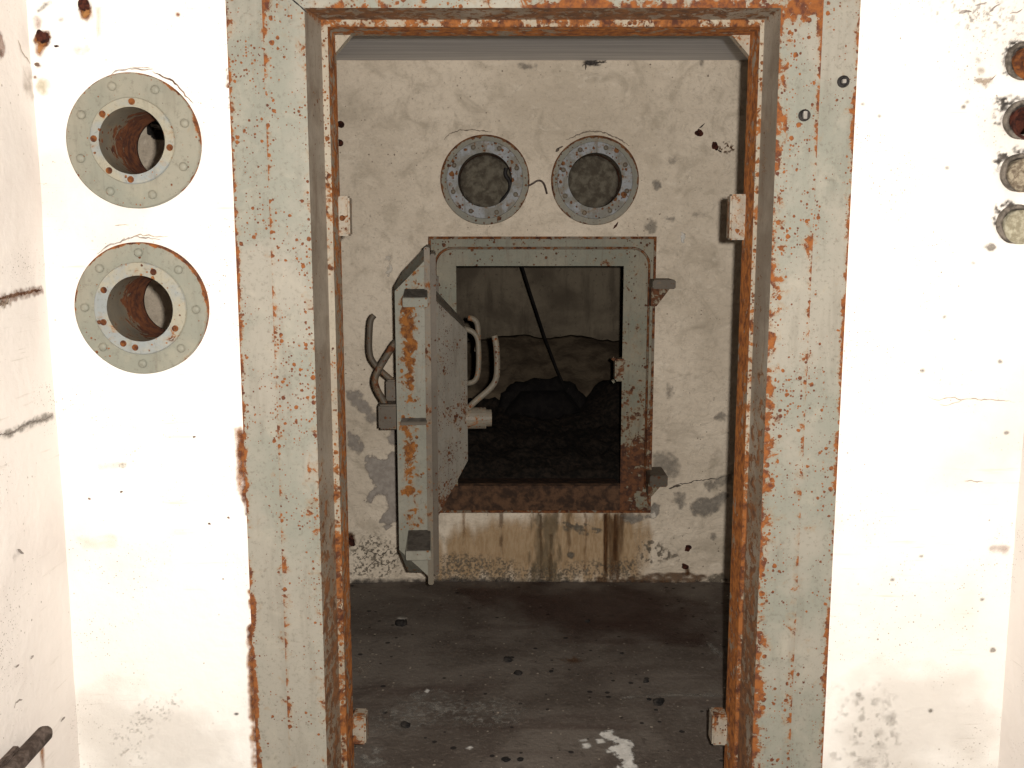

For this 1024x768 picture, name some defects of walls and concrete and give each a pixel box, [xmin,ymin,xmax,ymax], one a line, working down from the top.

rust [237,430,247,515]
crack [669,474,733,489]
leakage [437,513,648,582]
rust [247,624,257,765]